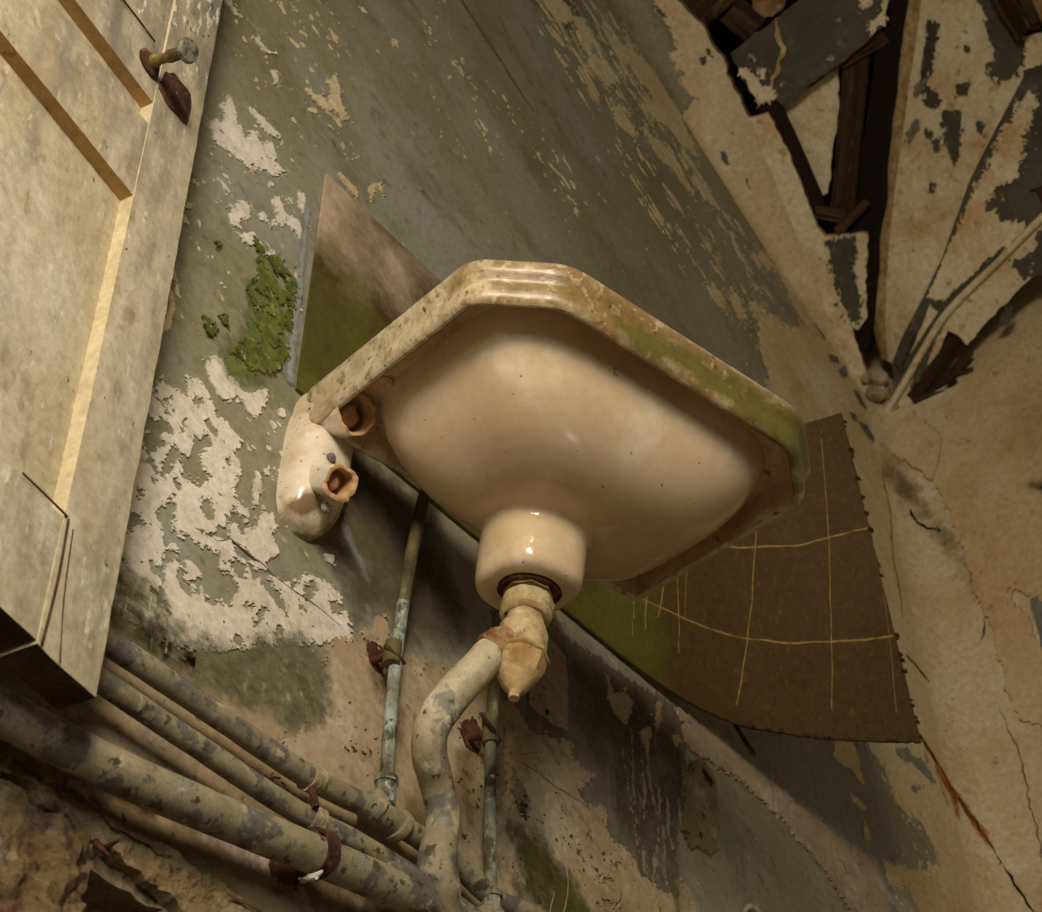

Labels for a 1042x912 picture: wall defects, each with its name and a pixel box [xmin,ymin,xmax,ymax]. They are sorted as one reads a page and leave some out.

peeling [207,93,315,259]
crack [462,0,534,111]
peeling [536,0,721,260]
peeling [737,67,778,109]
peeling [819,0,1042,392]
peeling [447,261,1003,912]
flaking render [0,740,252,912]
peeling [270,769,418,865]
peeling [394,652,446,827]
corrosion [921,739,987,841]
crack [919,733,1034,912]
crack [999,710,1042,857]